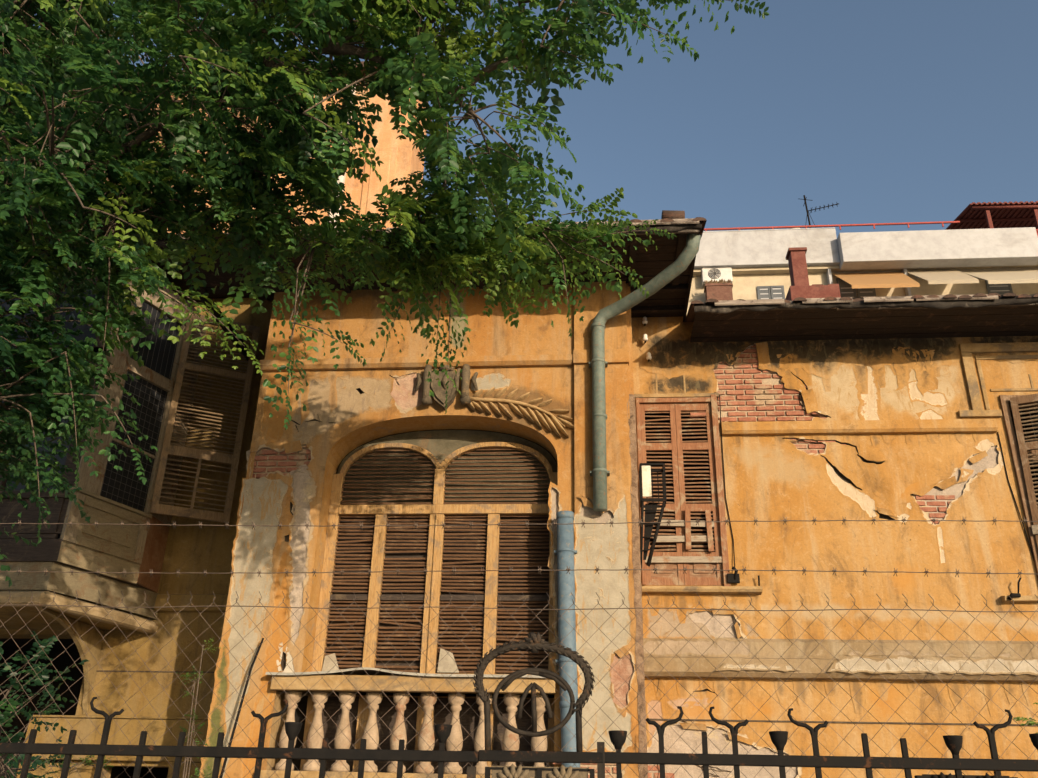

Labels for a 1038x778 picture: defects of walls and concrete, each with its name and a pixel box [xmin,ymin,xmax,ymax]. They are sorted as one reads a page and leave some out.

peeling [469,371,512,393]
flaking render [690,342,967,424]
crack [782,372,883,490]
damp [637,328,1038,396]
peeling [216,369,423,778]
peeling [547,394,1038,778]